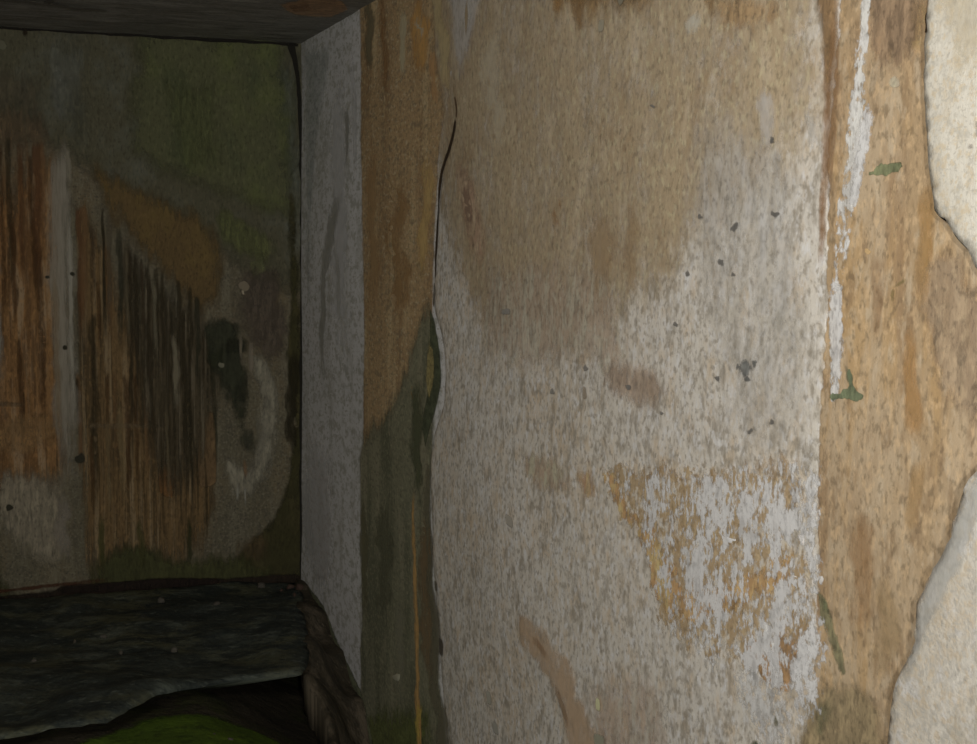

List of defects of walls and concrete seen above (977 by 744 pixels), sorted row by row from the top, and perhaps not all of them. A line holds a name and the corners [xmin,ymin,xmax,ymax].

leakage [0,29,327,492]
leakage [360,506,394,606]
leakage [410,390,449,744]
crack [433,97,457,306]
spalling [602,0,977,744]
leakage [829,0,873,401]